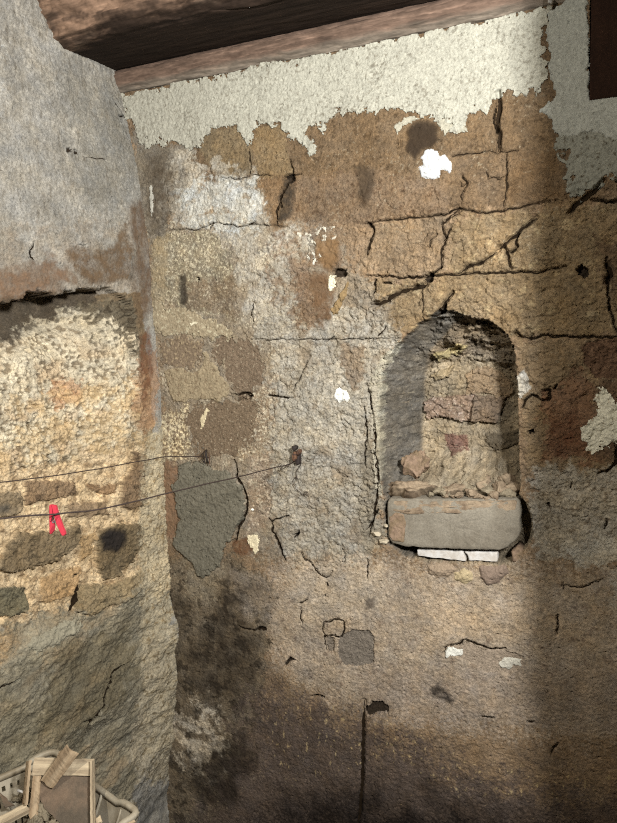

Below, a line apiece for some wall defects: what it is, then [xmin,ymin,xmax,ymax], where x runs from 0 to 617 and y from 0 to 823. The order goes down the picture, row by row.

water stain [407,123,437,158]
crack [365,99,617,320]
peeling [297,226,336,265]
spalling [328,275,336,291]
crack [514,258,617,340]
crack [267,326,398,341]
spalling [0,285,144,472]
crack [235,360,308,399]
peeling [369,356,386,494]
spalling [327,629,374,666]
crack [444,639,503,652]
crack [357,700,365,823]